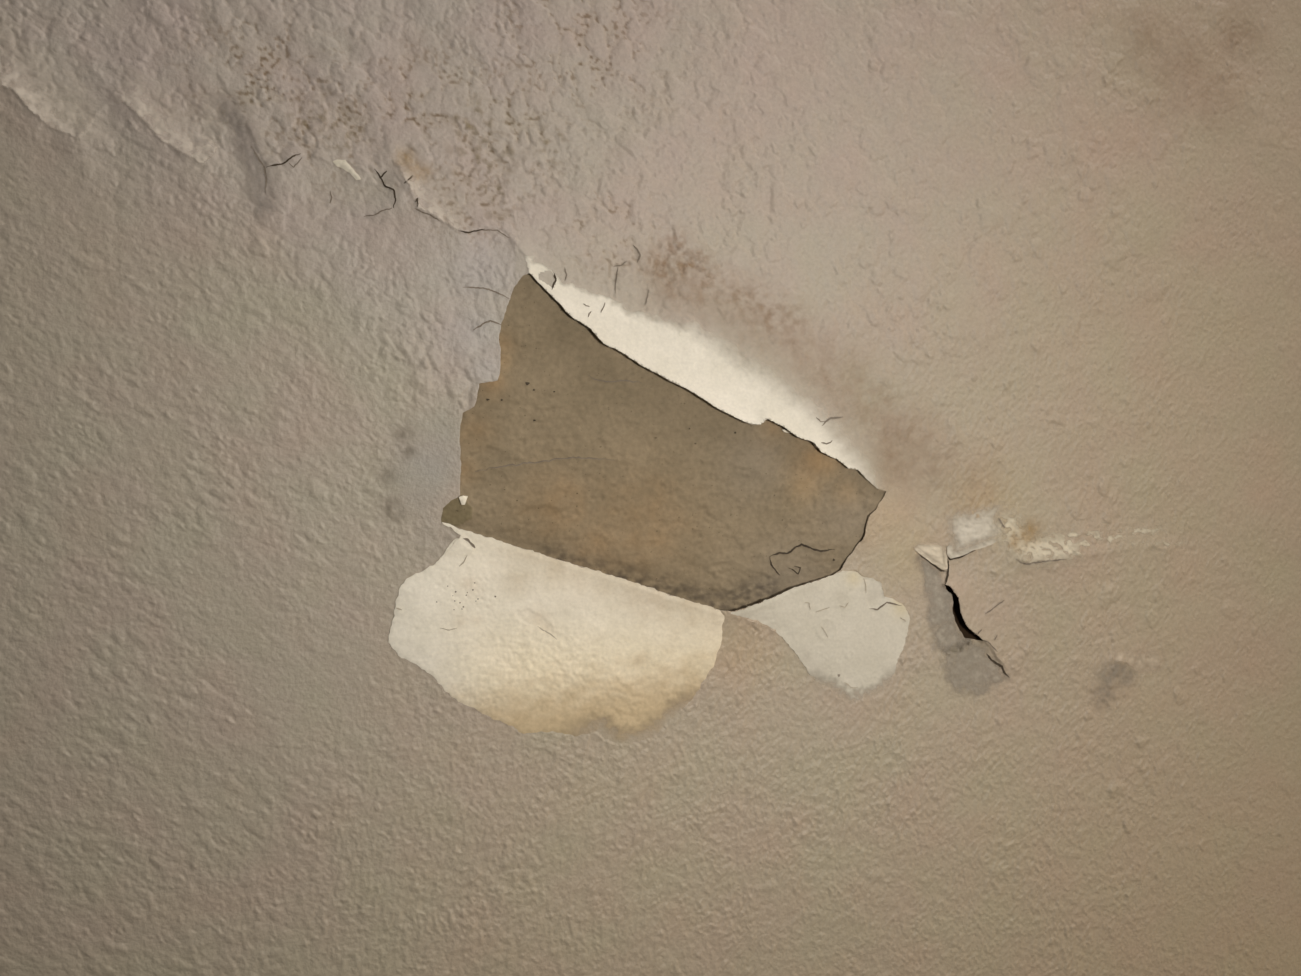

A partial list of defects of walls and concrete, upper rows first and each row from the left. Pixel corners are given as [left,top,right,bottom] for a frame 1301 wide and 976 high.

peeling [332,159,361,180]
peeling [388,273,910,736]
crack [945,556,1045,688]
peeling [914,498,1192,651]